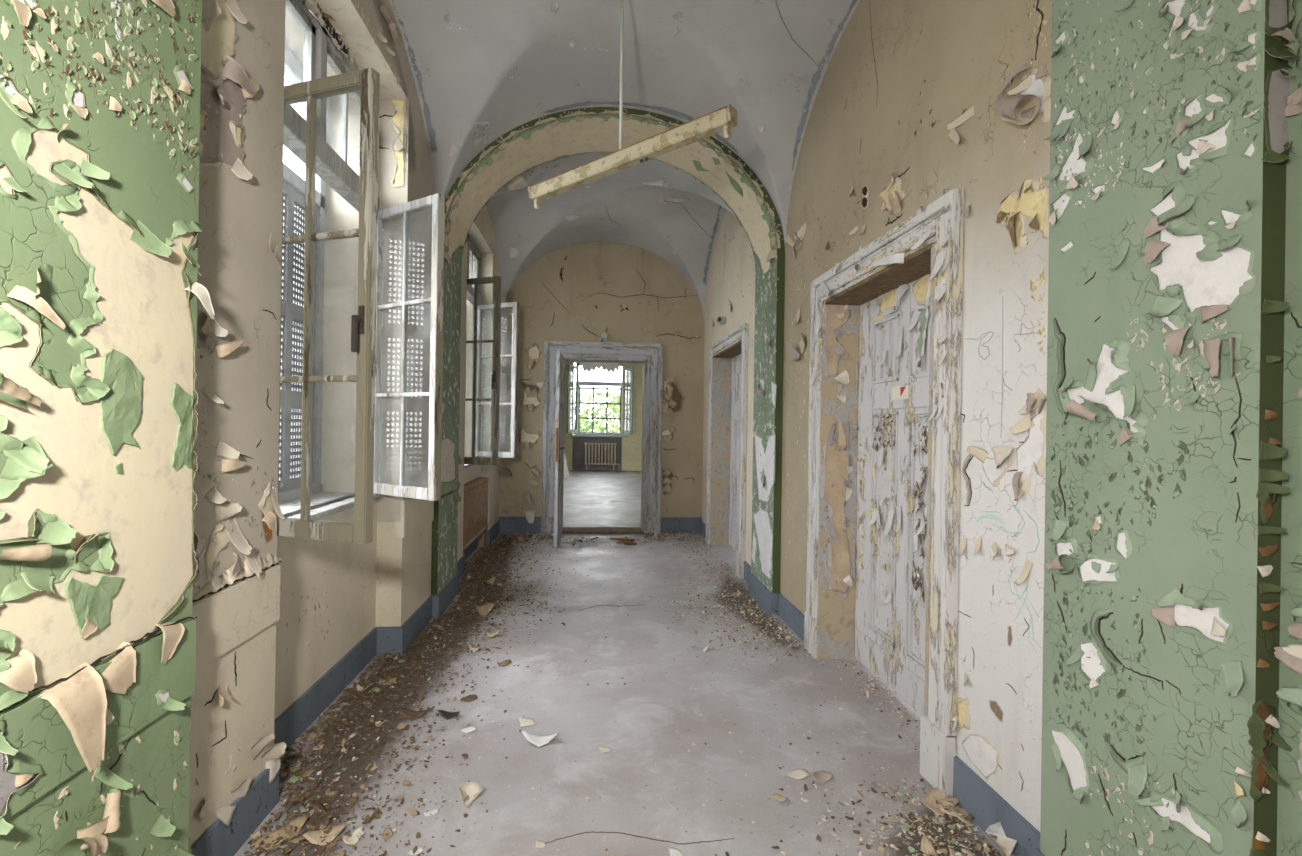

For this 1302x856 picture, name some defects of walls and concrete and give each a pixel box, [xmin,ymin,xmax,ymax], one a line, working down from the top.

spalling [305,0,354,64]
peeling [444,107,679,282]
crack [540,256,702,339]
peeling [0,0,330,856]
peeling [439,396,462,505]
peeling [499,428,542,539]
peeling [520,343,544,412]
peeling [641,137,971,606]
peeling [897,0,1302,856]
crack [1052,574,1181,695]
peeling [250,815,363,856]
crack [1098,745,1182,845]